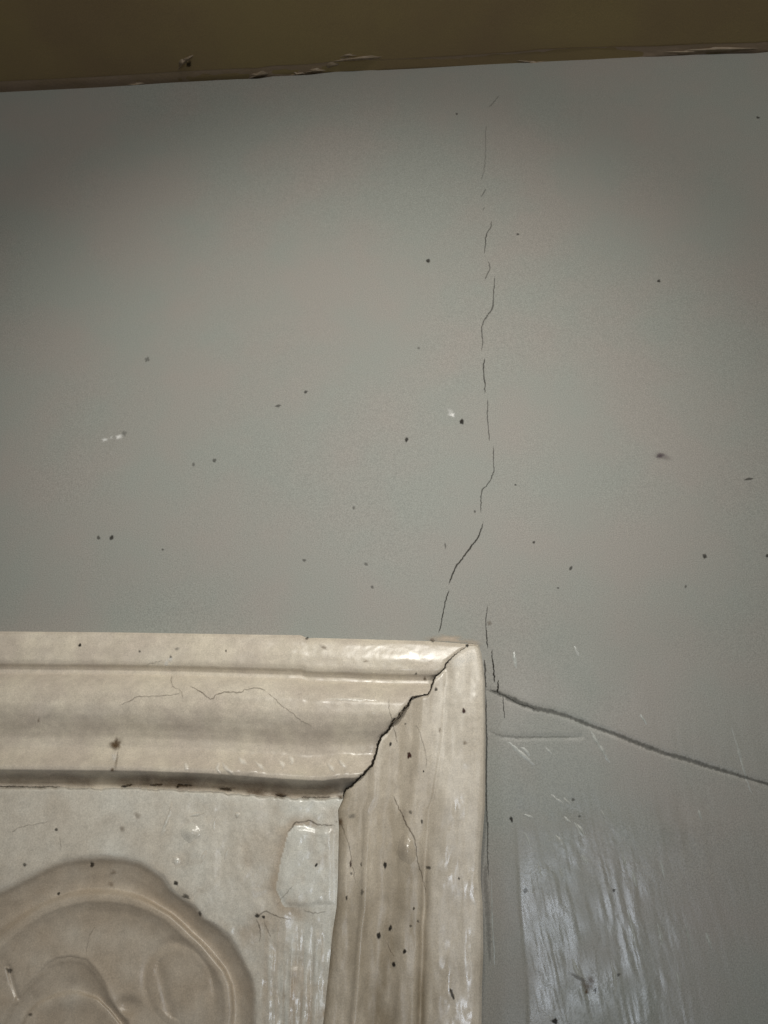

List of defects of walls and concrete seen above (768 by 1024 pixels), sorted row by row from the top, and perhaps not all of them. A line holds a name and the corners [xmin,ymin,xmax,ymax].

crack [439,524,483,631]
crack [344,649,462,792]
crack [484,608,768,785]